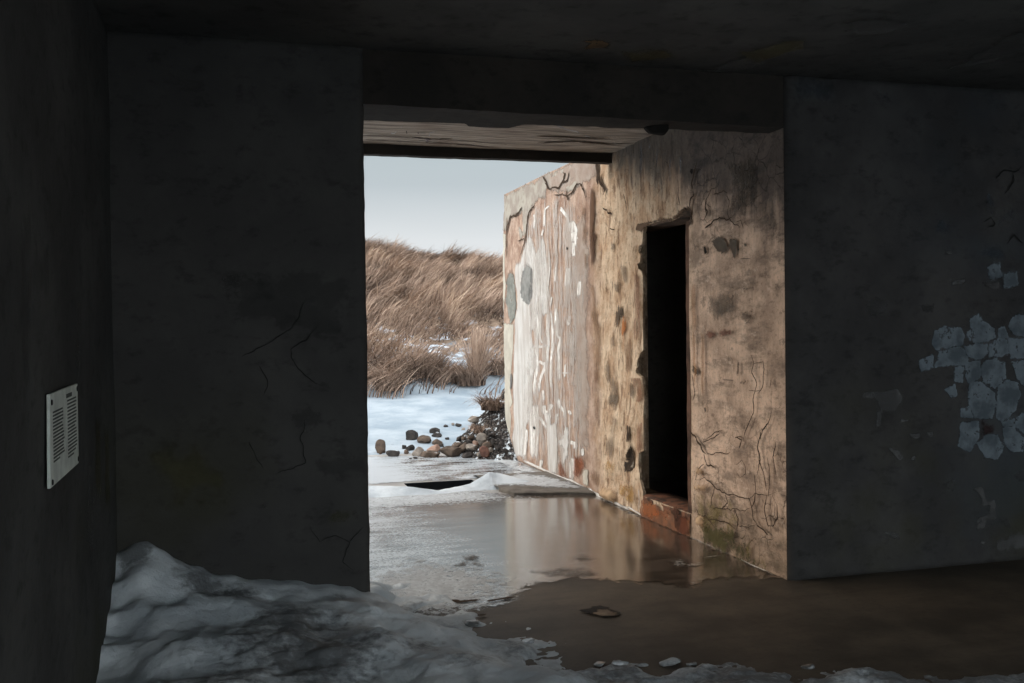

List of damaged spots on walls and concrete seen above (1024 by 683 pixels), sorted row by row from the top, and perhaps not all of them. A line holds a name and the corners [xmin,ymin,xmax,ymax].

crack [505,136,635,258]
crack [678,163,757,228]
spalling [704,237,750,259]
spalling [505,266,533,323]
flaking render [919,313,1024,460]
spalling [624,423,642,472]
crack [689,355,778,535]
corrosion [640,499,690,537]